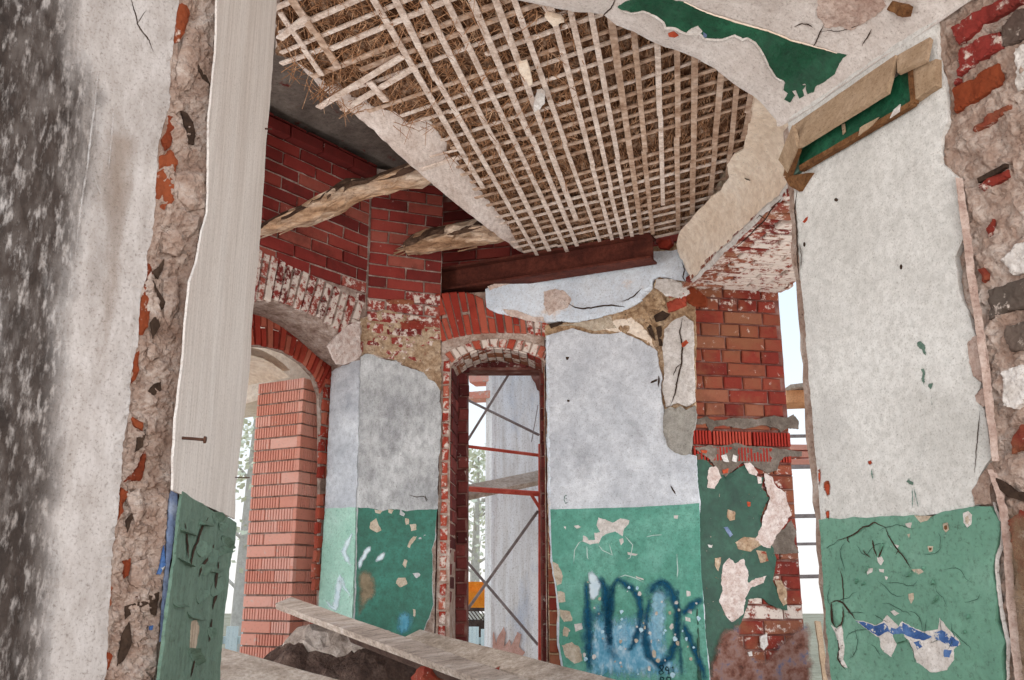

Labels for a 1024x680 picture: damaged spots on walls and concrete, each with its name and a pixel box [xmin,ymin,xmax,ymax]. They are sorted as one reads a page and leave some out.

crack [131,0,152,48]
peeling [617,0,846,102]
spalling [104,0,236,680]
crack [568,288,642,309]
crack [651,318,683,406]
spalling [940,0,1024,680]
peeling [396,518,417,587]
peeling [552,562,596,664]
peeling [564,517,637,556]
peeling [614,591,701,675]
peeling [707,454,792,622]
crack [827,522,980,669]